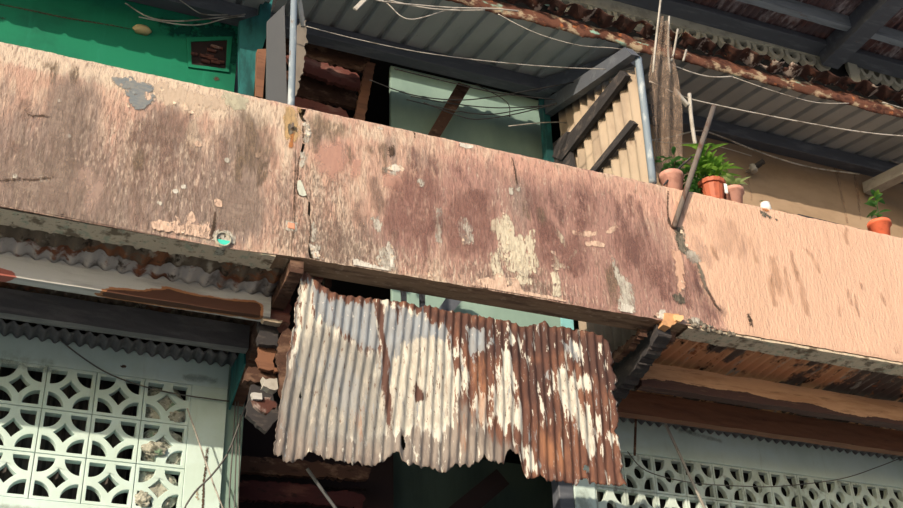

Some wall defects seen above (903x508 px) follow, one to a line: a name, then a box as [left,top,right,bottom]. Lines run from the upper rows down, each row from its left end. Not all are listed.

peeling [112,76,230,148]
crack [293,109,313,259]
peeling [151,211,211,239]
peeling [459,218,474,245]
peeling [471,213,618,302]
peeling [611,258,635,313]
crack [666,191,720,311]